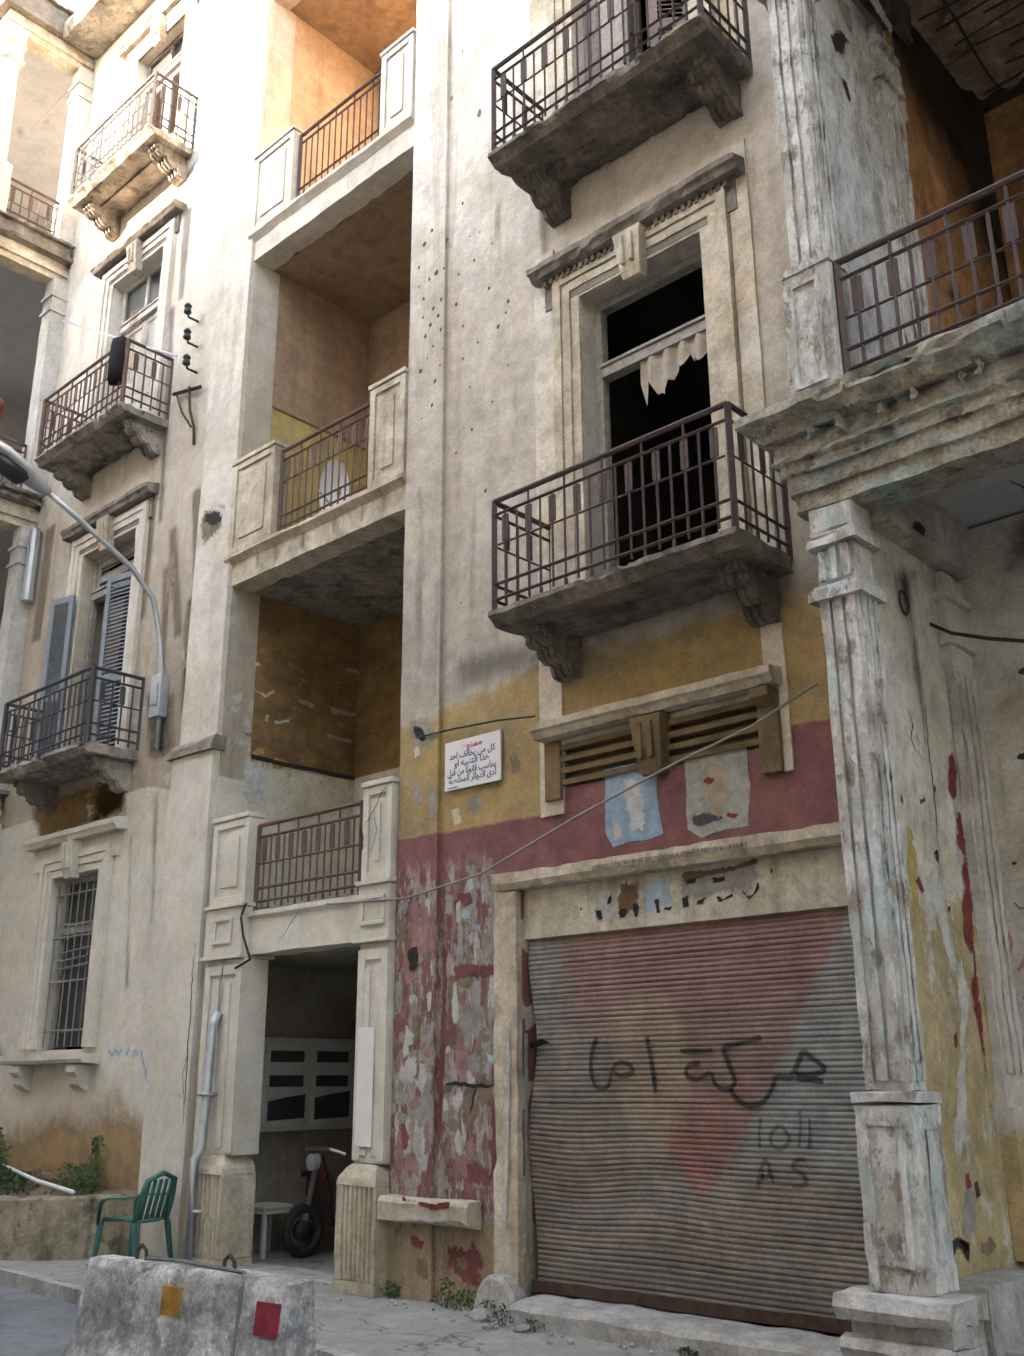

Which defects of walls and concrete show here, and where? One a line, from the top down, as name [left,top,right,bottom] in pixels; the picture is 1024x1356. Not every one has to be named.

spalling [904,0,1024,100]
peeling [394,854,511,1287]
peeling [906,751,997,1262]